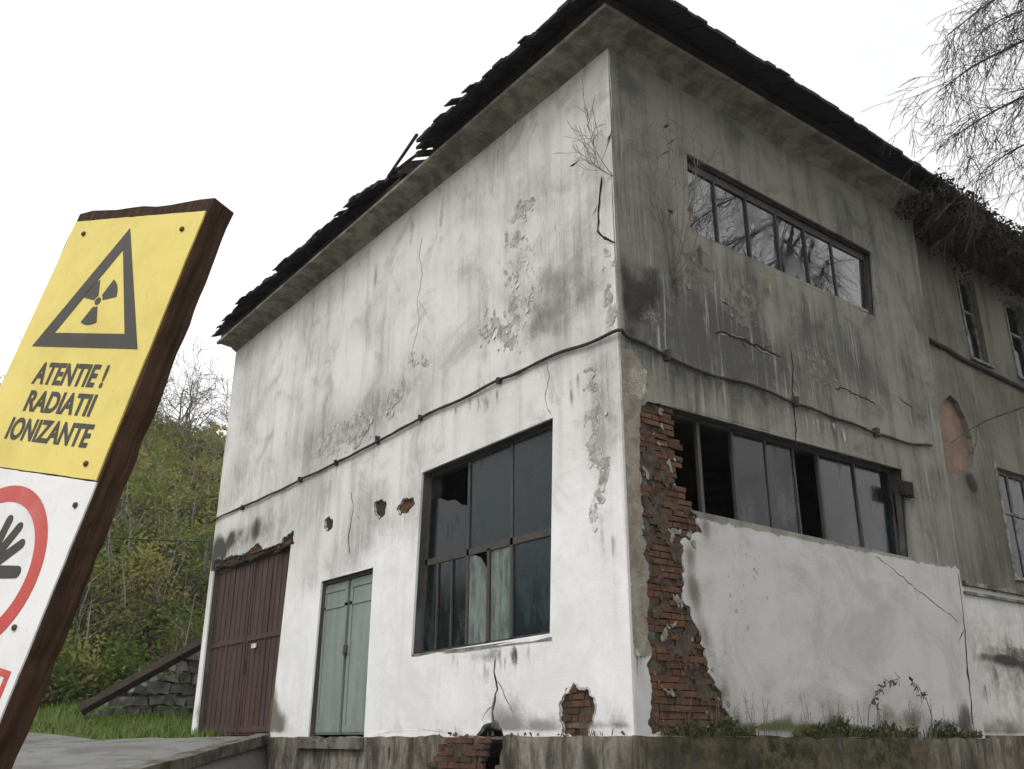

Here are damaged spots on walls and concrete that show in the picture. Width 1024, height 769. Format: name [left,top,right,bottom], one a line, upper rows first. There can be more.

peeling [477,195,545,354]
damp [622,266,661,318]
crack [715,302,799,454]
peeling [583,366,610,531]
spalling [374,497,415,520]
flaking render [621,348,732,734]
crack [482,660,512,726]
flaking render [558,681,597,737]
crack [877,557,973,724]
damp [981,650,1024,695]
flaking render [427,720,504,769]